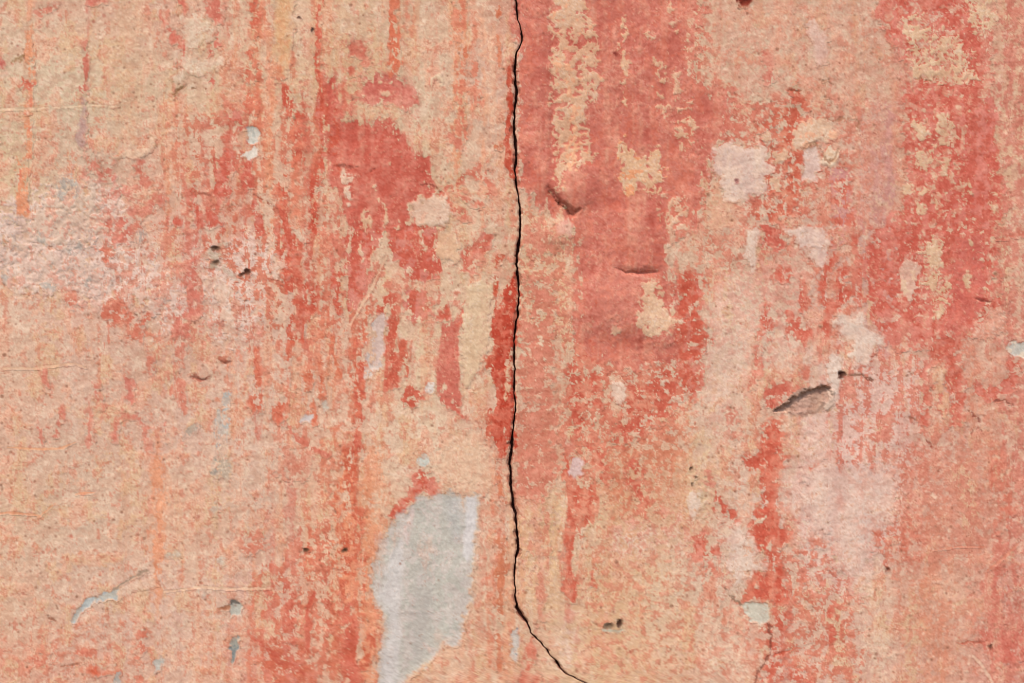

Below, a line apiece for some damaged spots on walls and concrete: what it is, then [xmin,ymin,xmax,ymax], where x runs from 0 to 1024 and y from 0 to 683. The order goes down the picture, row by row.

crack [506,0,587,683]
spalling [70,569,160,624]
spalling [367,453,485,683]
peeling [703,349,839,683]